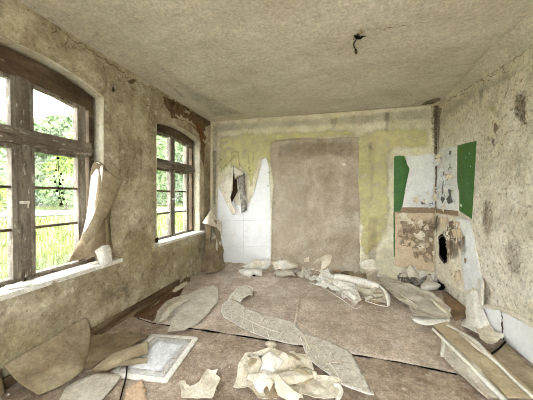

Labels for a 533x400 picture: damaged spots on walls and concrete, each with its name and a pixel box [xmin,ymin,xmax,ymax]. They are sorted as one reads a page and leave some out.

crack [41,17,159,118]
flaking render [163,96,210,166]
water stain [423,98,442,159]
crack [442,48,531,105]
water stain [516,95,526,123]
peeling [393,141,484,306]